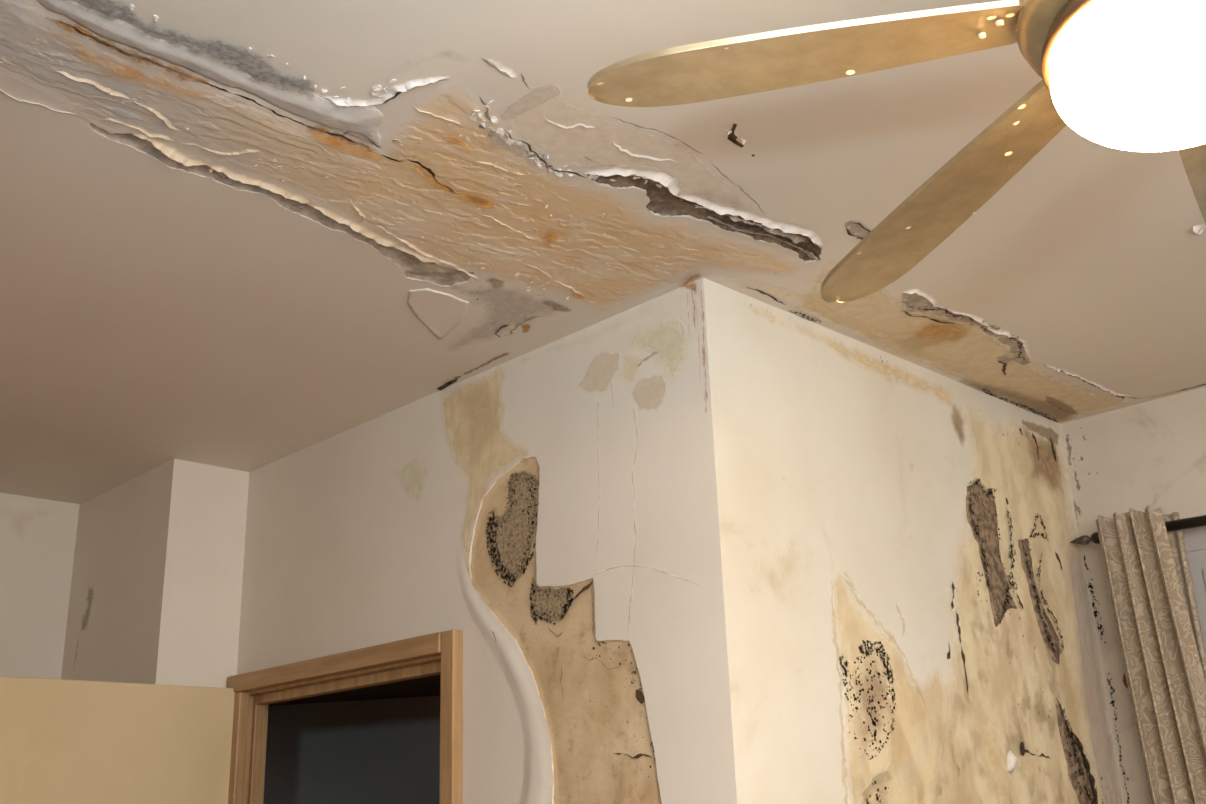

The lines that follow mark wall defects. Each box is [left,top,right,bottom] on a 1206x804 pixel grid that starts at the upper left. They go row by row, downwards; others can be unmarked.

peeling [0,0,826,340]
leakage [543,116,597,129]
leakage [611,117,765,215]
spalling [845,221,871,240]
leakage [461,279,569,338]
peeling [901,288,1033,375]
leakage [634,378,665,408]
leakage [437,353,656,777]
spalling [470,457,662,804]
leakage [839,386,1130,804]